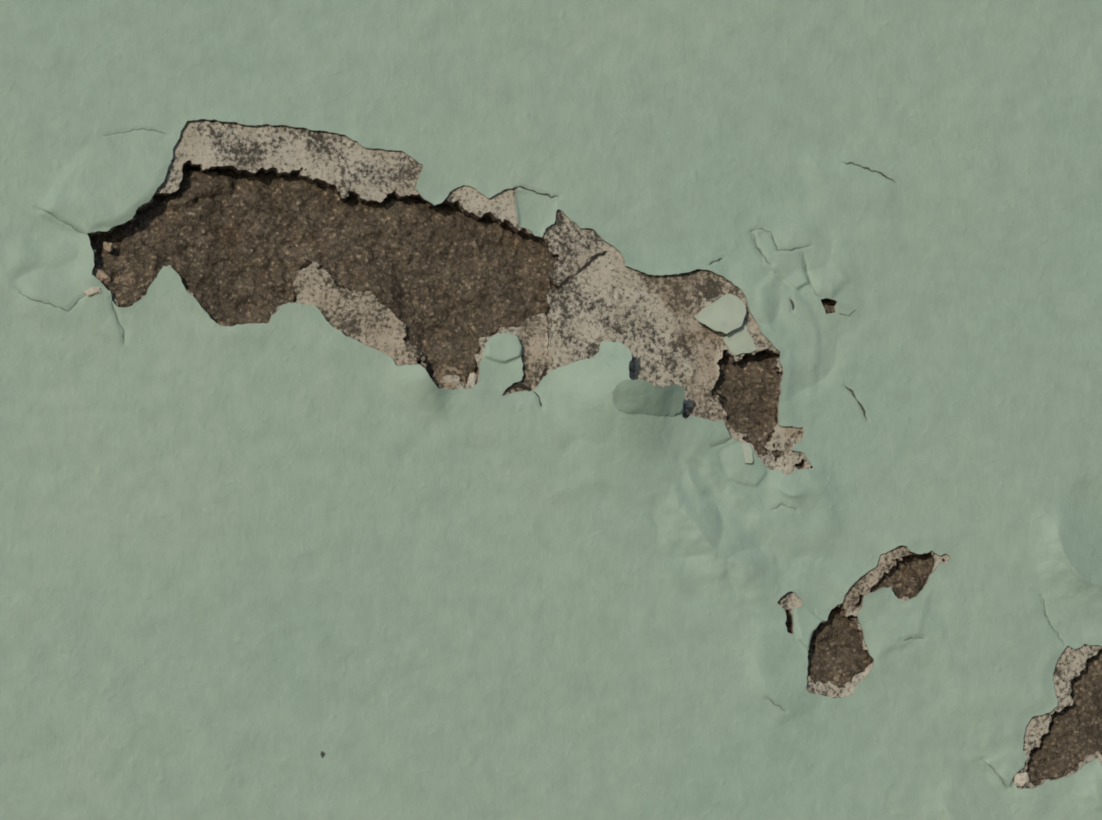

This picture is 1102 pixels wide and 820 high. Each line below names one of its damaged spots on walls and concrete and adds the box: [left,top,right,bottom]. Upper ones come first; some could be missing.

crack [842,161,895,182]
spalling [41,119,856,487]
peeling [777,545,1102,789]